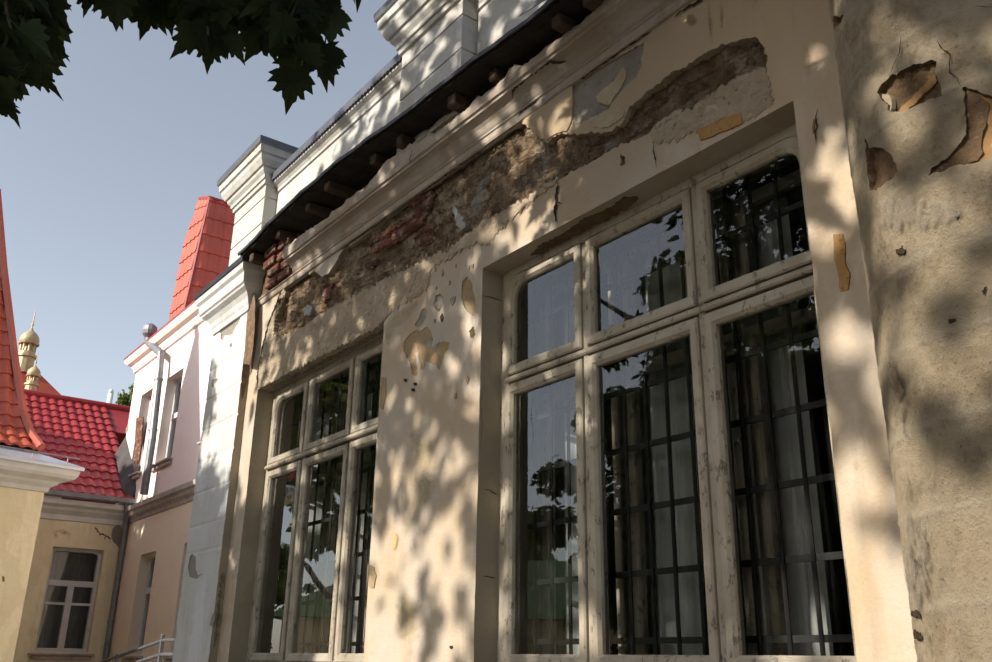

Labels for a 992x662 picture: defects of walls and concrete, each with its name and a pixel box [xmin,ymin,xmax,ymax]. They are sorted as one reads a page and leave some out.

crack [342,31,651,249]
spalling [258,42,774,391]
peeling [833,234,851,291]
spalling [872,148,898,190]
spalling [882,40,942,112]
spalling [934,42,992,172]